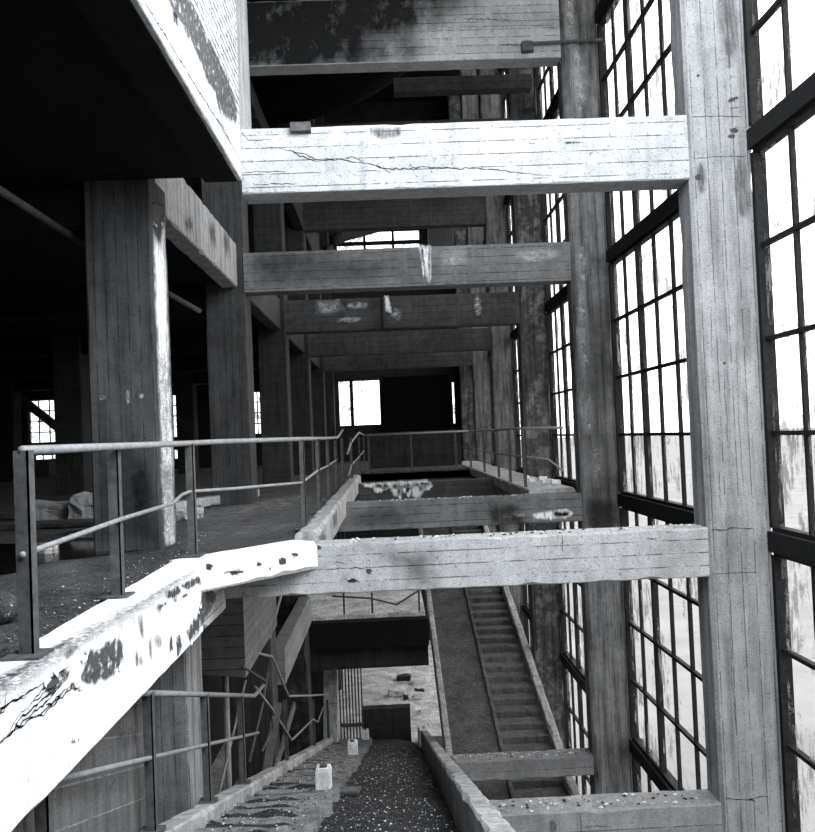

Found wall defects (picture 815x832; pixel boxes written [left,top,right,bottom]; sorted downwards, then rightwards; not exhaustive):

flaking render [169,0,237,125]
crack [145,3,556,176]
crack [243,171,297,185]
peeling [44,631,126,694]
crack [0,667,82,744]